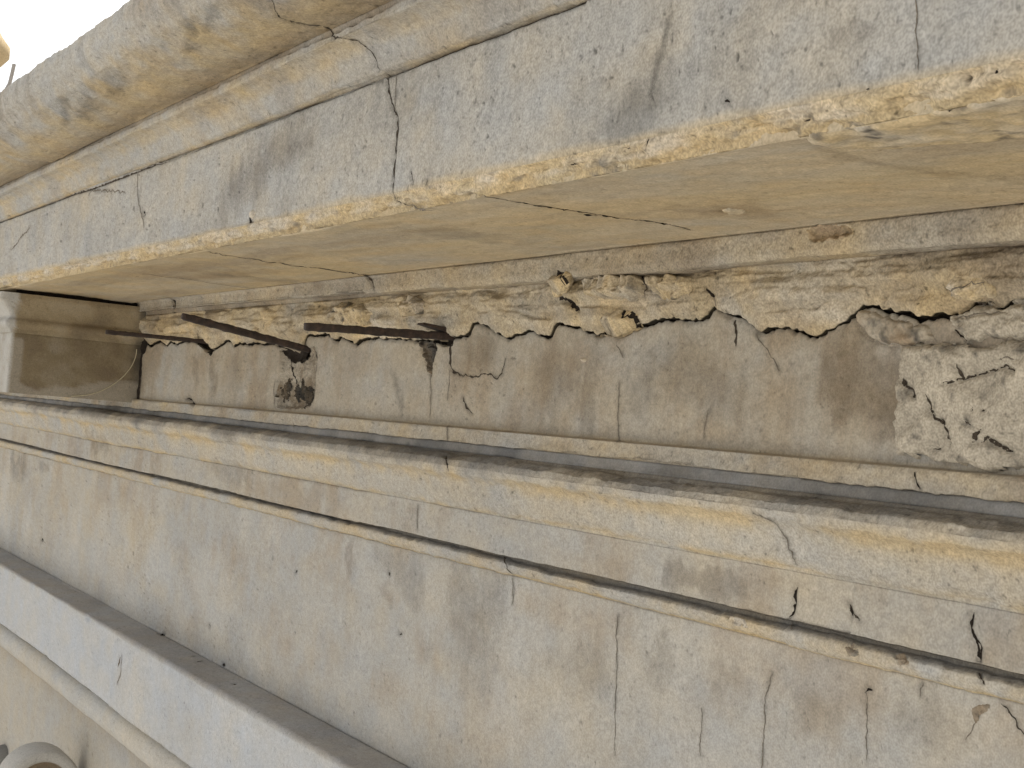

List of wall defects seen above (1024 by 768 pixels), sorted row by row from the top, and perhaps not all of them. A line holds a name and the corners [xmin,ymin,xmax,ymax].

crack [272,1,432,211]
spalling [326,302,373,326]
rust [417,322,447,332]
peeling [595,310,644,338]
crack [871,281,999,321]
spalling [946,276,1024,345]
spalling [273,346,317,410]
spalling [419,341,438,417]
crack [428,324,623,413]
crack [902,356,1015,440]
peeling [965,407,1013,452]
crack [970,614,985,685]